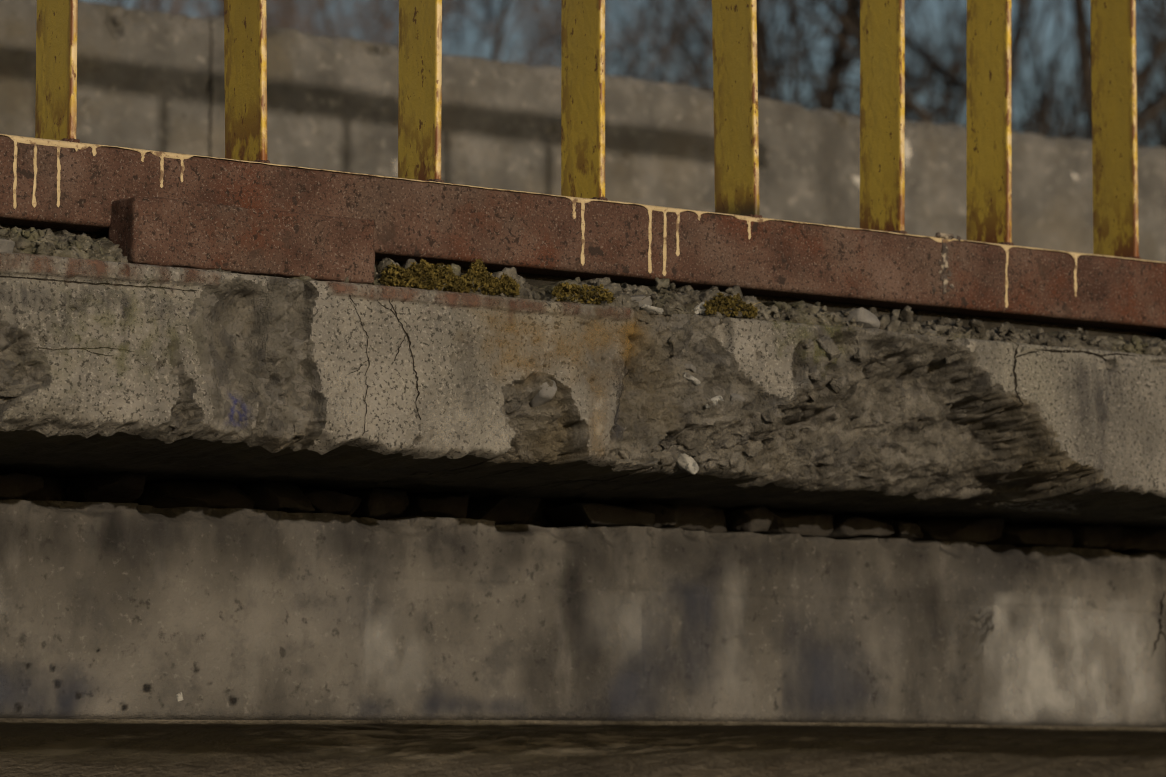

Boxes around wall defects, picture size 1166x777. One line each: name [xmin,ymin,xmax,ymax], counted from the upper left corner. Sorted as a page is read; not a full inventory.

spalling [0,313,52,422]
spalling [138,276,327,453]
crack [349,296,421,436]
spalling [481,371,590,466]
spalling [606,304,1141,502]
leakage [984,605,1003,637]
leakage [990,600,1147,718]
crack [1147,592,1166,661]
leakage [0,724,603,758]